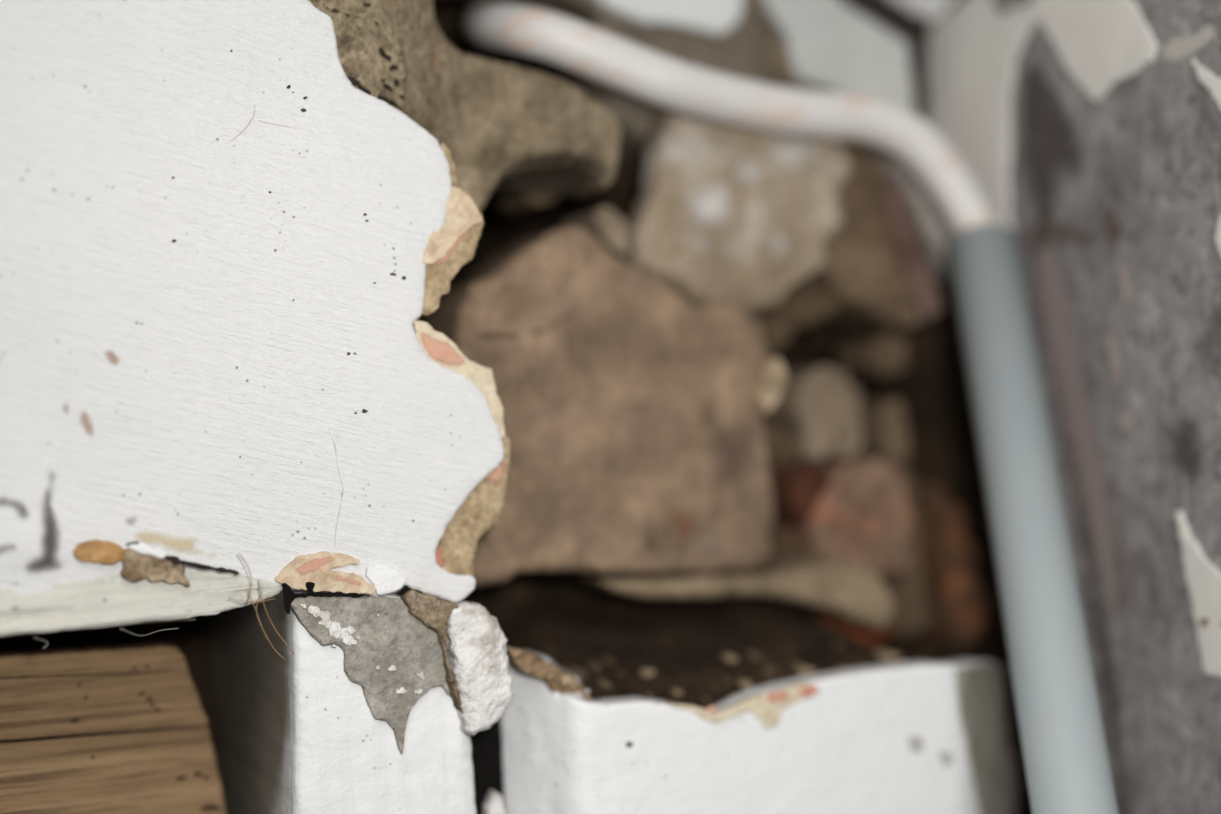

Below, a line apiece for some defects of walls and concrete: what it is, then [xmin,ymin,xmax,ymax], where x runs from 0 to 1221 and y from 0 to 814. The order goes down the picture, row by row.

peeling [760,0,1159,230]
peeling [1191,58,1221,110]
spalling [274,0,1032,814]
peeling [1175,510,1221,677]